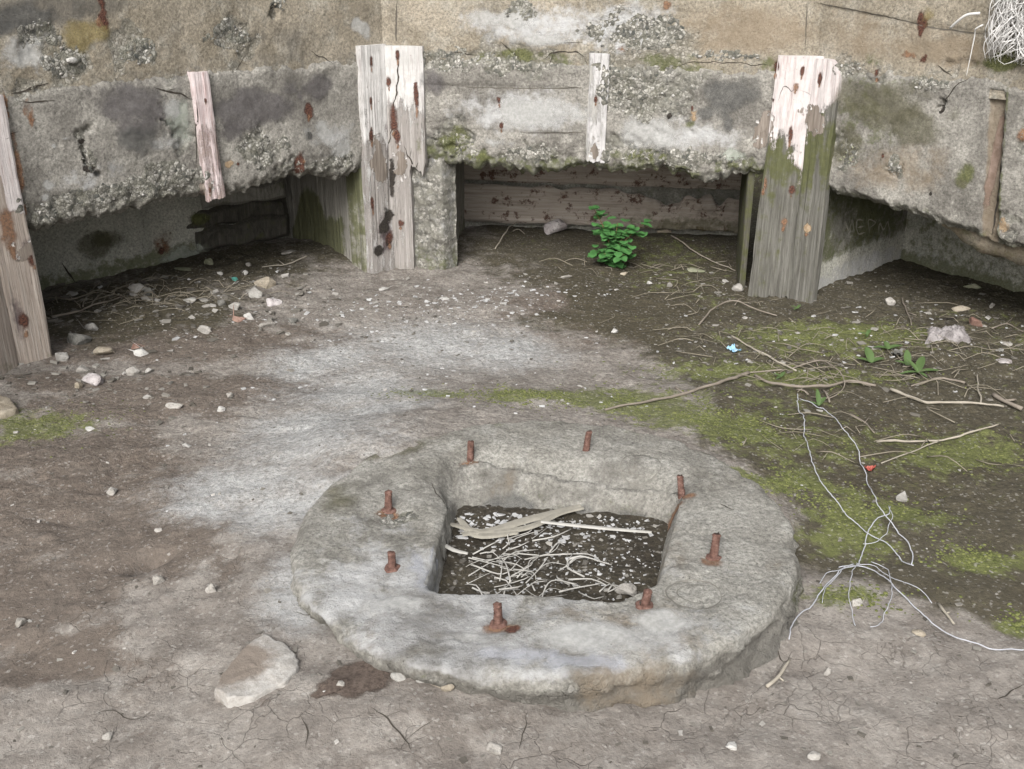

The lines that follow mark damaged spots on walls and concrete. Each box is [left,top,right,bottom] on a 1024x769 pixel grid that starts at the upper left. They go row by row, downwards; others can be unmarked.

rust [66,0,109,50]
water stain [103,85,188,148]
water stain [894,109,933,142]
spalling [15,130,214,223]
spalling [234,130,290,172]
spalling [312,150,354,174]
spalling [434,128,480,165]
spalling [495,142,562,166]
spalling [584,137,748,173]
rust [667,493,695,532]
rust [485,625,520,633]